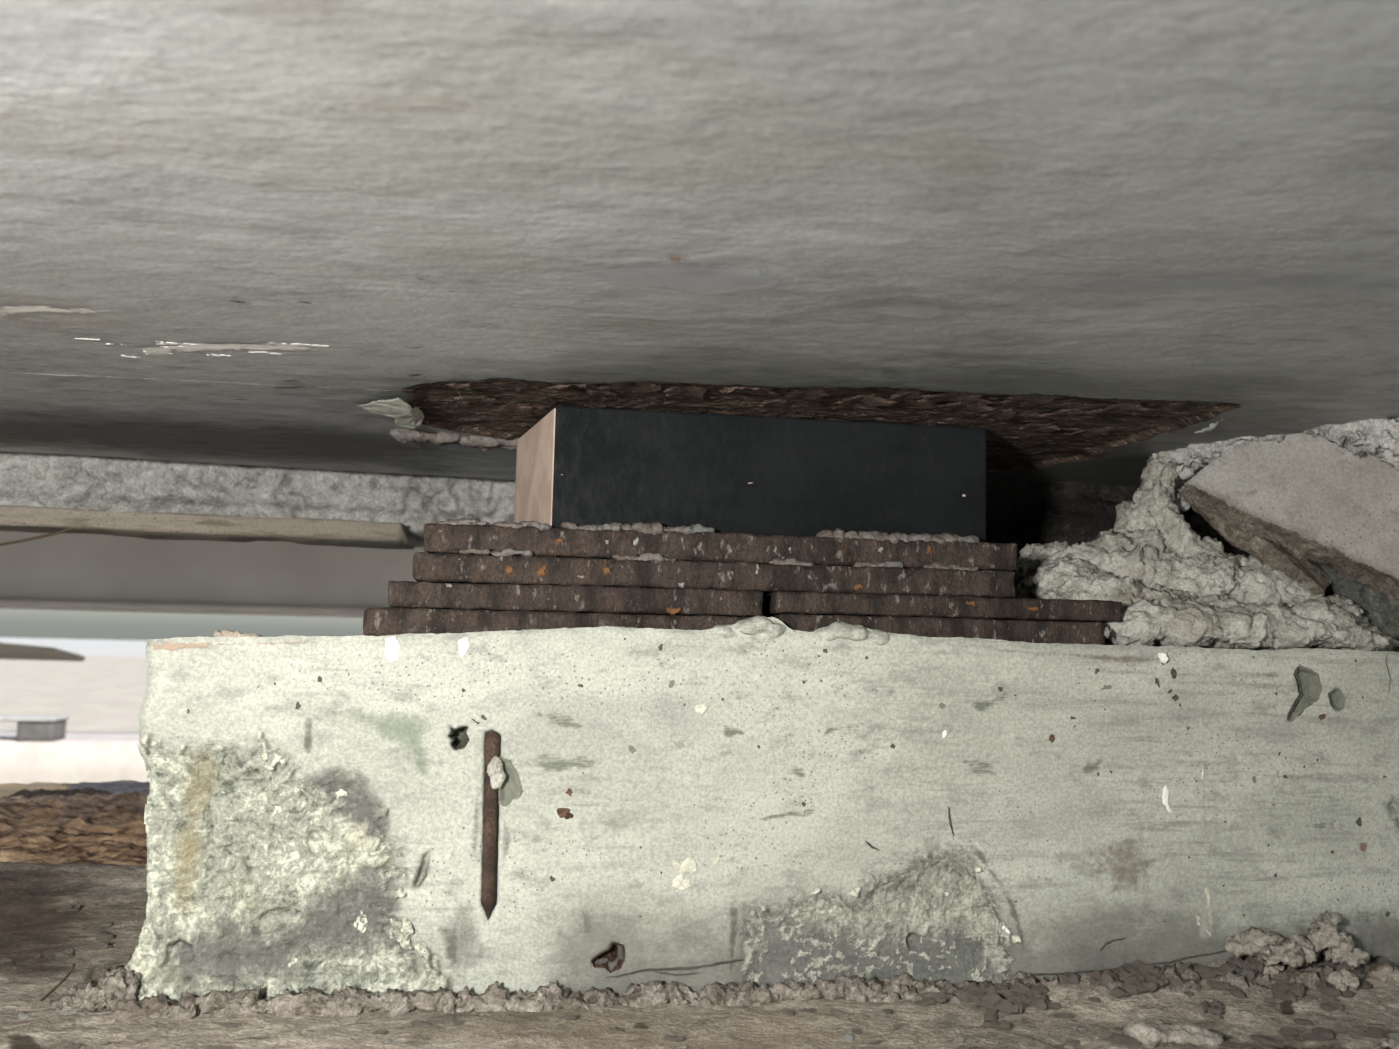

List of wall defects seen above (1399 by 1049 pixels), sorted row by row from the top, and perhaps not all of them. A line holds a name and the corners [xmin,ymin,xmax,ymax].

peeling [0,305,98,315]
peeling [75,338,329,358]
spalling [357,378,1241,473]
spalling [1288,665,1364,722]
spalling [77,931,115,990]
spalling [126,731,451,1003]
rust [481,731,506,919]
spalling [736,843,1030,986]